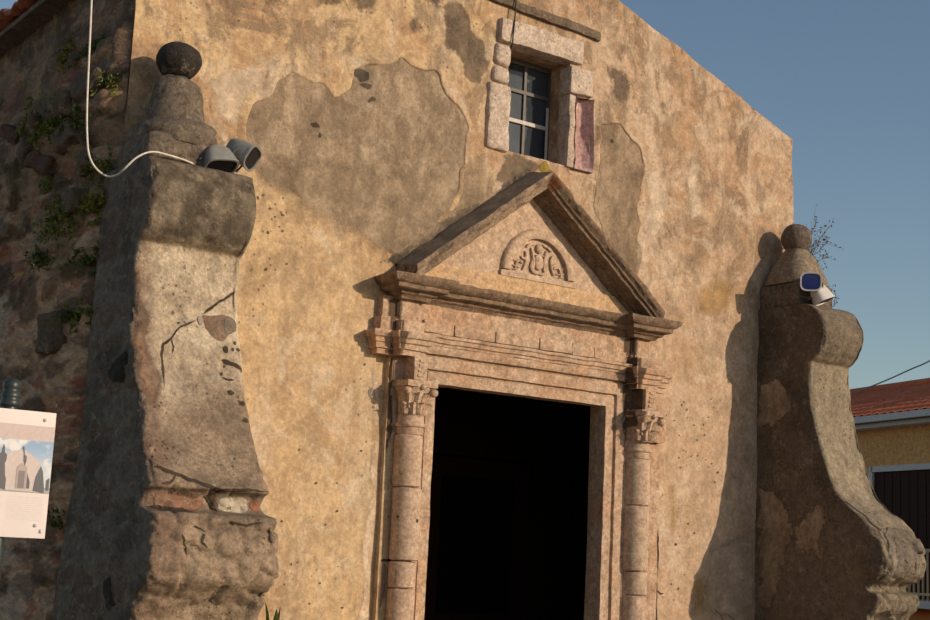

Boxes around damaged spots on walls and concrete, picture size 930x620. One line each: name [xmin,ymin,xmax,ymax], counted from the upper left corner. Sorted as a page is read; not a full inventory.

flaking render [237,48,482,263]
flaking render [588,118,649,279]
crack [161,292,235,385]
flaking render [198,315,240,353]
crack [222,359,242,381]